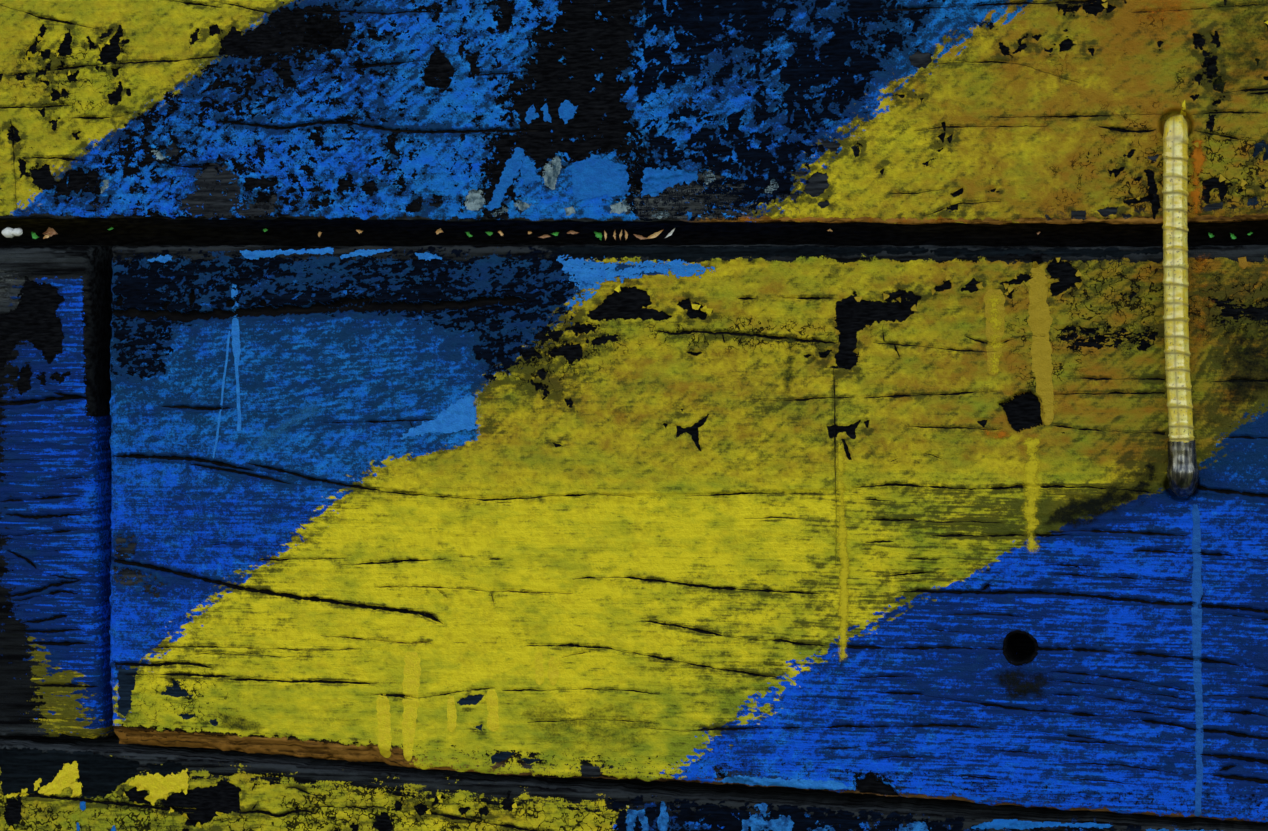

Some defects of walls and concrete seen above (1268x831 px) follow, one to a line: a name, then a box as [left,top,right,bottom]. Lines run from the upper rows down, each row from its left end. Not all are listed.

spalling [999,0,1127,60]
spalling [1180,31,1226,132]
spalling [922,122,953,166]
spalling [947,188,963,211]
spalling [1071,149,1161,220]
spalling [1201,174,1268,211]
peeling [110,245,1163,401]
crack [29,327,1268,785]
peeling [0,747,241,831]
spalling [334,794,447,831]
spalling [458,791,517,818]
peeling [608,795,988,831]